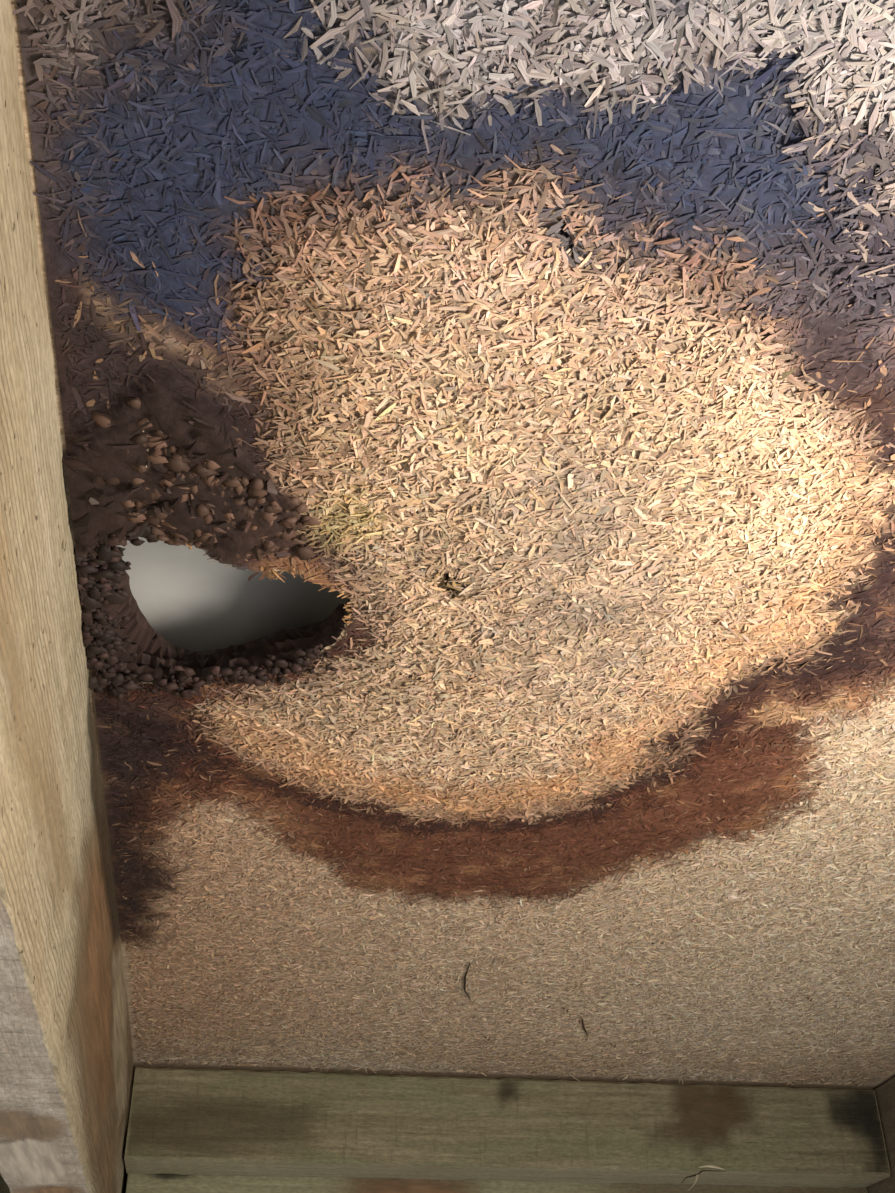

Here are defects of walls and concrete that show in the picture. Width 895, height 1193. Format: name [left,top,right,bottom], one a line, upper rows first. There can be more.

water stain [16,0,895,498]
spalling [434,571,472,604]
water stain [461,451,682,709]
water stain [71,502,895,1193]
peeling [124,679,895,1085]